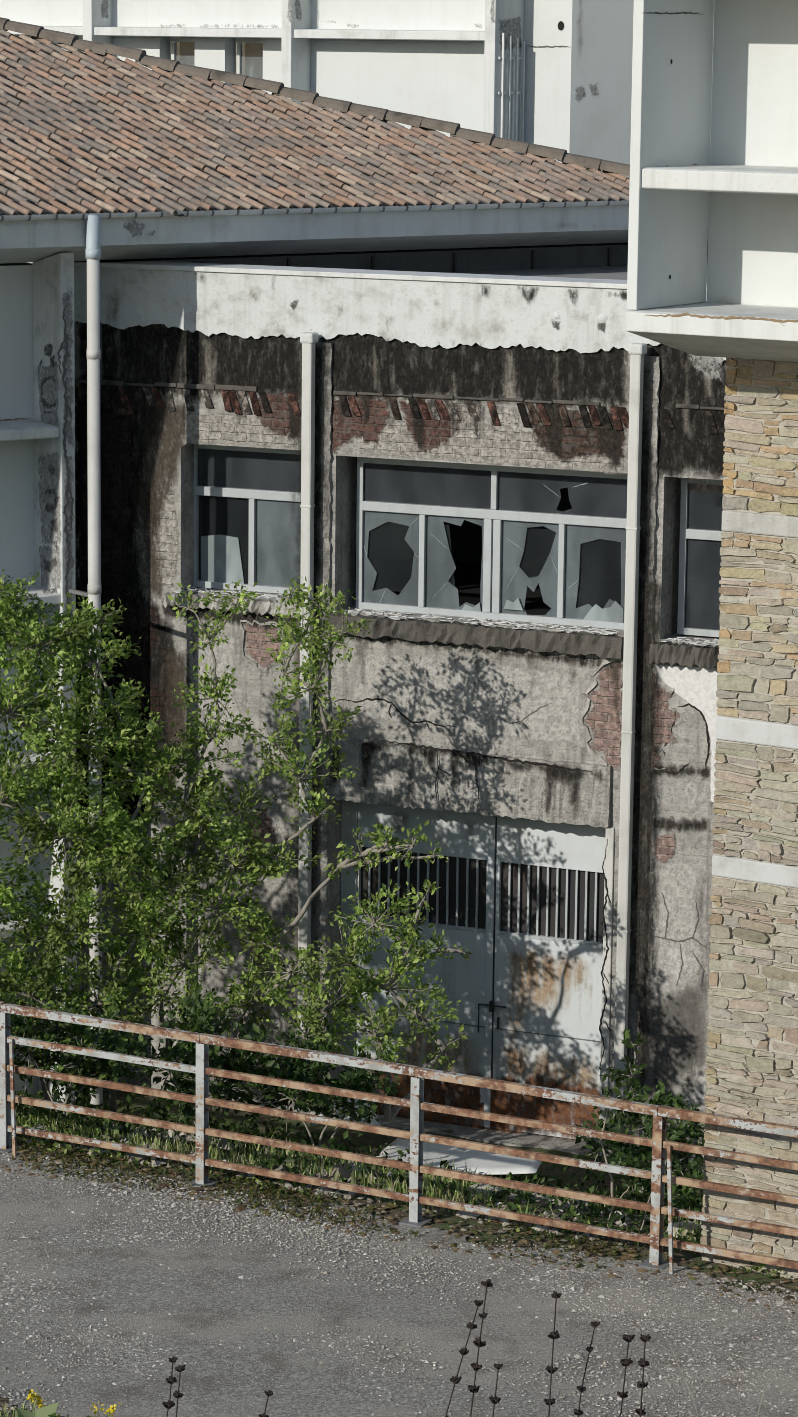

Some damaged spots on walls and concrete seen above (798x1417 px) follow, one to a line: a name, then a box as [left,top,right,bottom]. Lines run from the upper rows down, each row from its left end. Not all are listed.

peeling [490,0,522,51]
peeling [158,391,300,452]
peeling [331,396,628,474]
spalling [38,292,179,717]
damp [75,322,627,1022]
crack [334,698,591,808]
peeling [351,652,623,772]
damp [627,344,727,1125]
crack [661,703,710,774]
rust [516,954,581,1004]